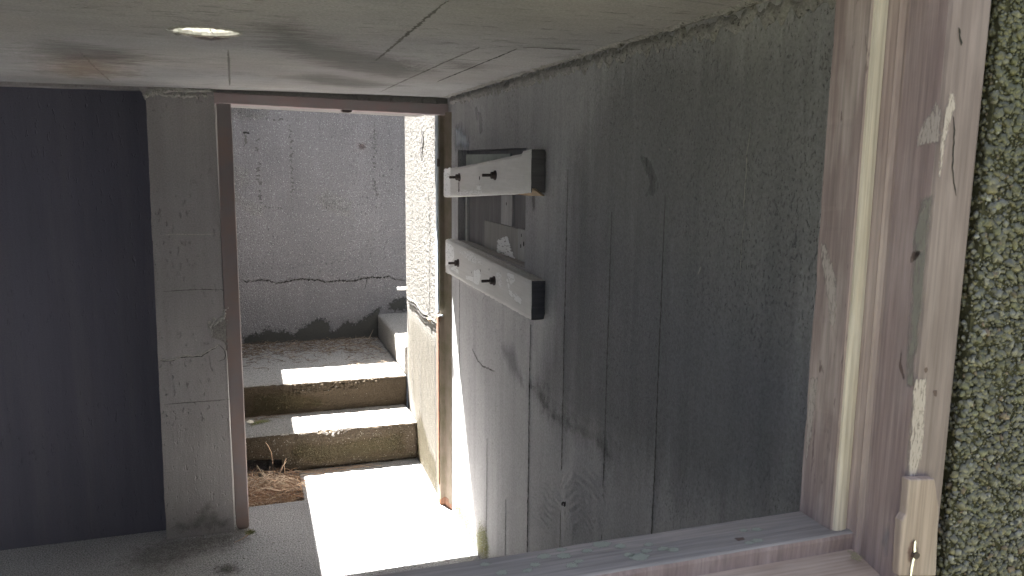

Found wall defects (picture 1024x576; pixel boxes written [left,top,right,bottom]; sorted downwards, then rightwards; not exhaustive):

peeling [917,94,955,178]
crack [166,273,435,324]
peeling [908,379,926,476]